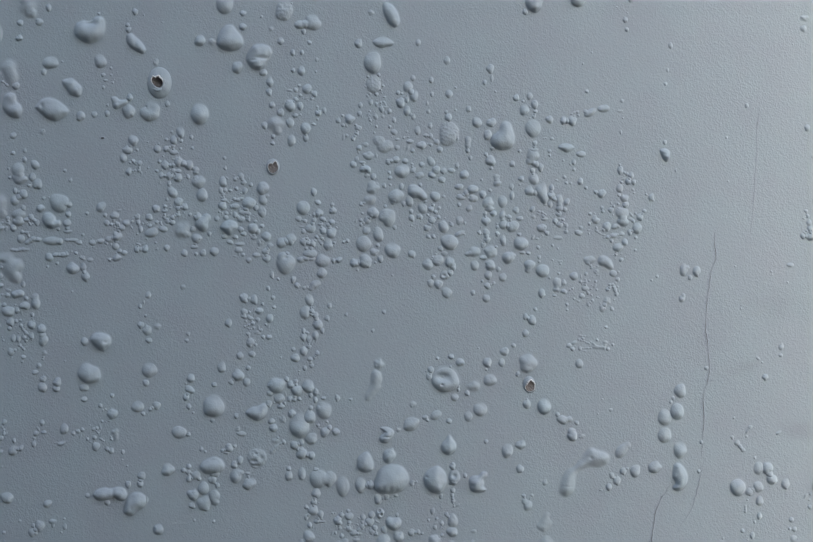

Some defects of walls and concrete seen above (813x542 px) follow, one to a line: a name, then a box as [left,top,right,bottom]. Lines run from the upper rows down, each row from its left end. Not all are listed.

crack [648,486,669,542]
crack [675,229,717,535]